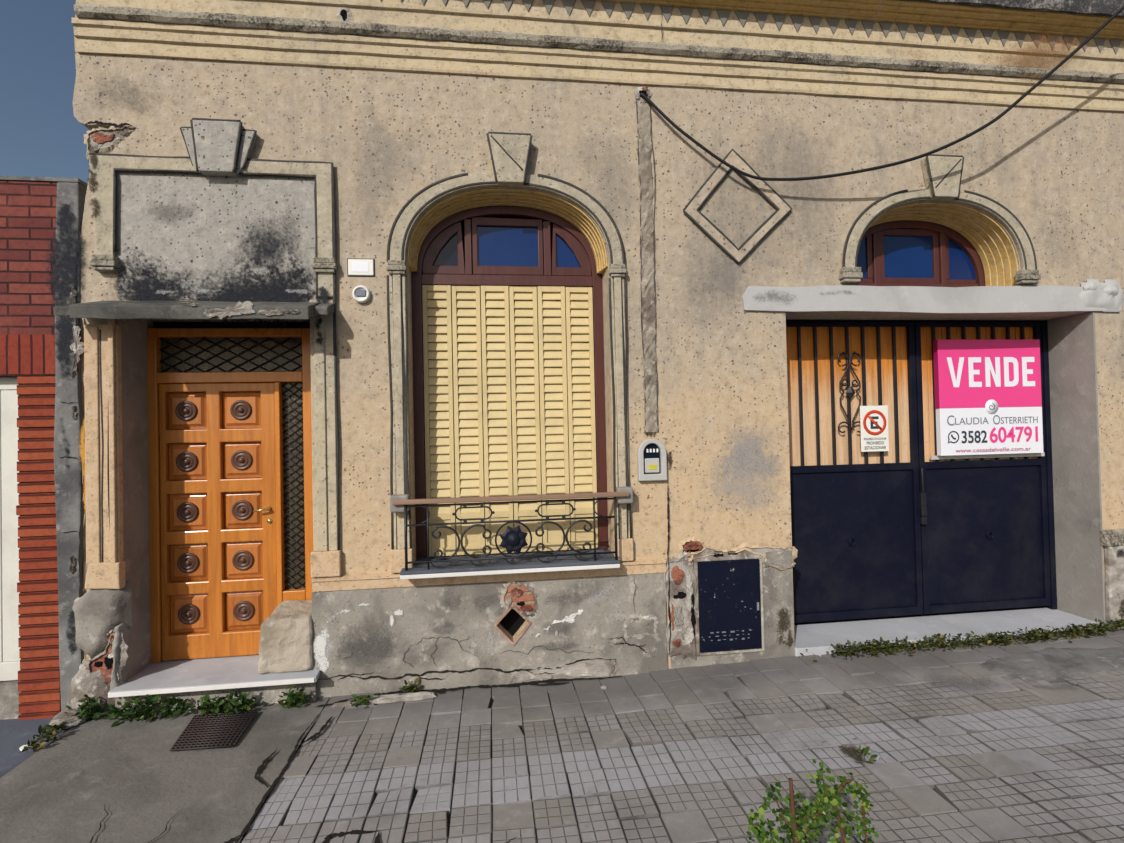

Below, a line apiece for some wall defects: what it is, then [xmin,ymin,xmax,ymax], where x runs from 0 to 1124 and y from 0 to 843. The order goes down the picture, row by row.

spalling [84,125,136,161]
leakage [114,227,329,345]
crack [318,480,671,680]
spalling [500,580,540,617]
peeling [536,609,583,638]
spalling [623,536,798,660]
spalling [84,626,128,688]